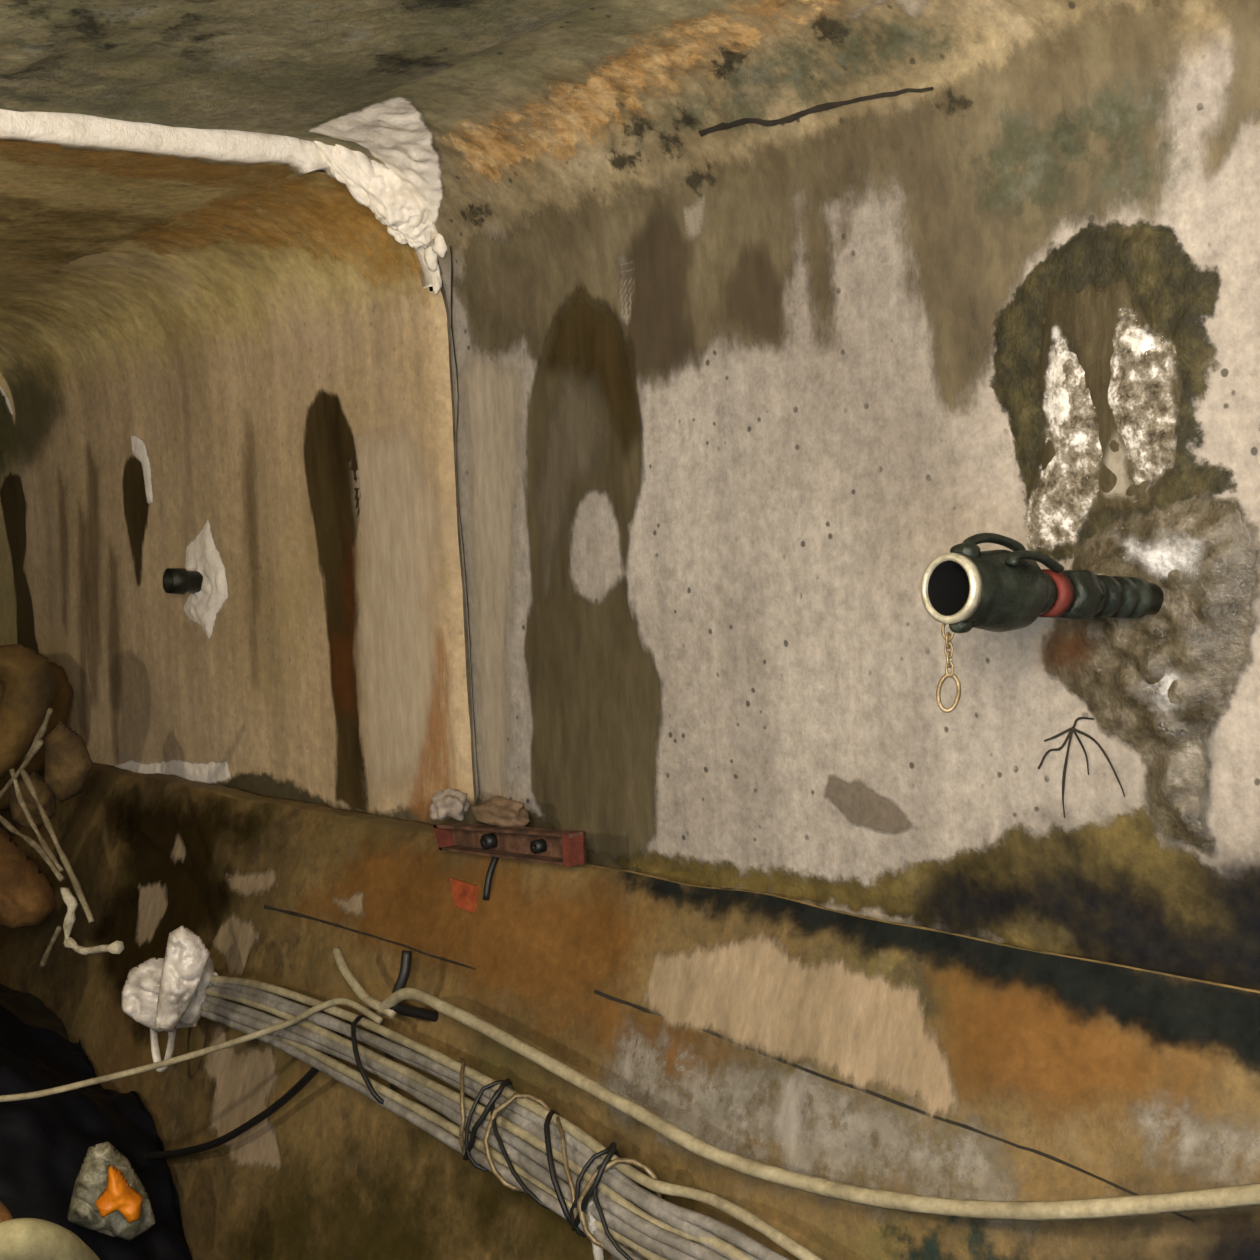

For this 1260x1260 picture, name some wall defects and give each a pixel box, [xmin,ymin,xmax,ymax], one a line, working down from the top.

leakage [97,0,1260,1071]
crack [698,87,934,137]